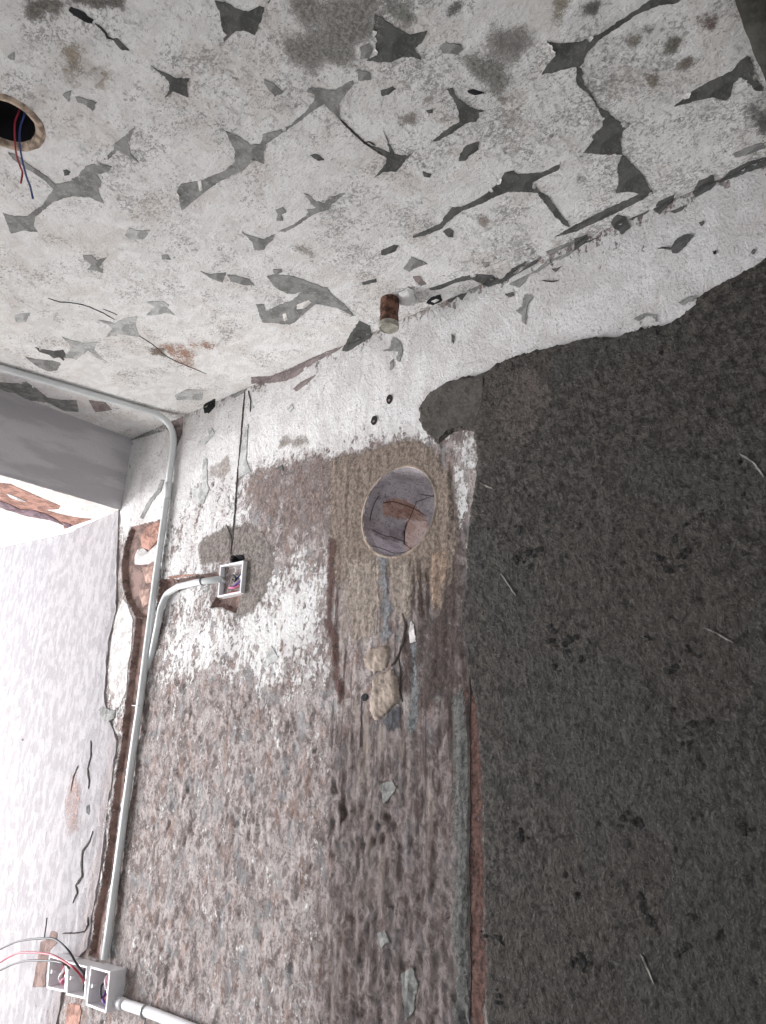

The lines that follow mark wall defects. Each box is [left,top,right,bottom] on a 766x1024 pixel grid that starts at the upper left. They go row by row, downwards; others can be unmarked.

peeling [3,127,139,234]
peeling [177,14,427,211]
peeling [404,0,685,325]
peeling [674,56,763,107]
peeling [693,143,766,197]
peeling [230,269,372,398]
flaking render [0,483,91,529]
leakage [198,523,274,616]
crack [70,741,92,791]
leakage [248,435,471,1024]
crack [62,831,93,934]
rust [463,688,487,1024]